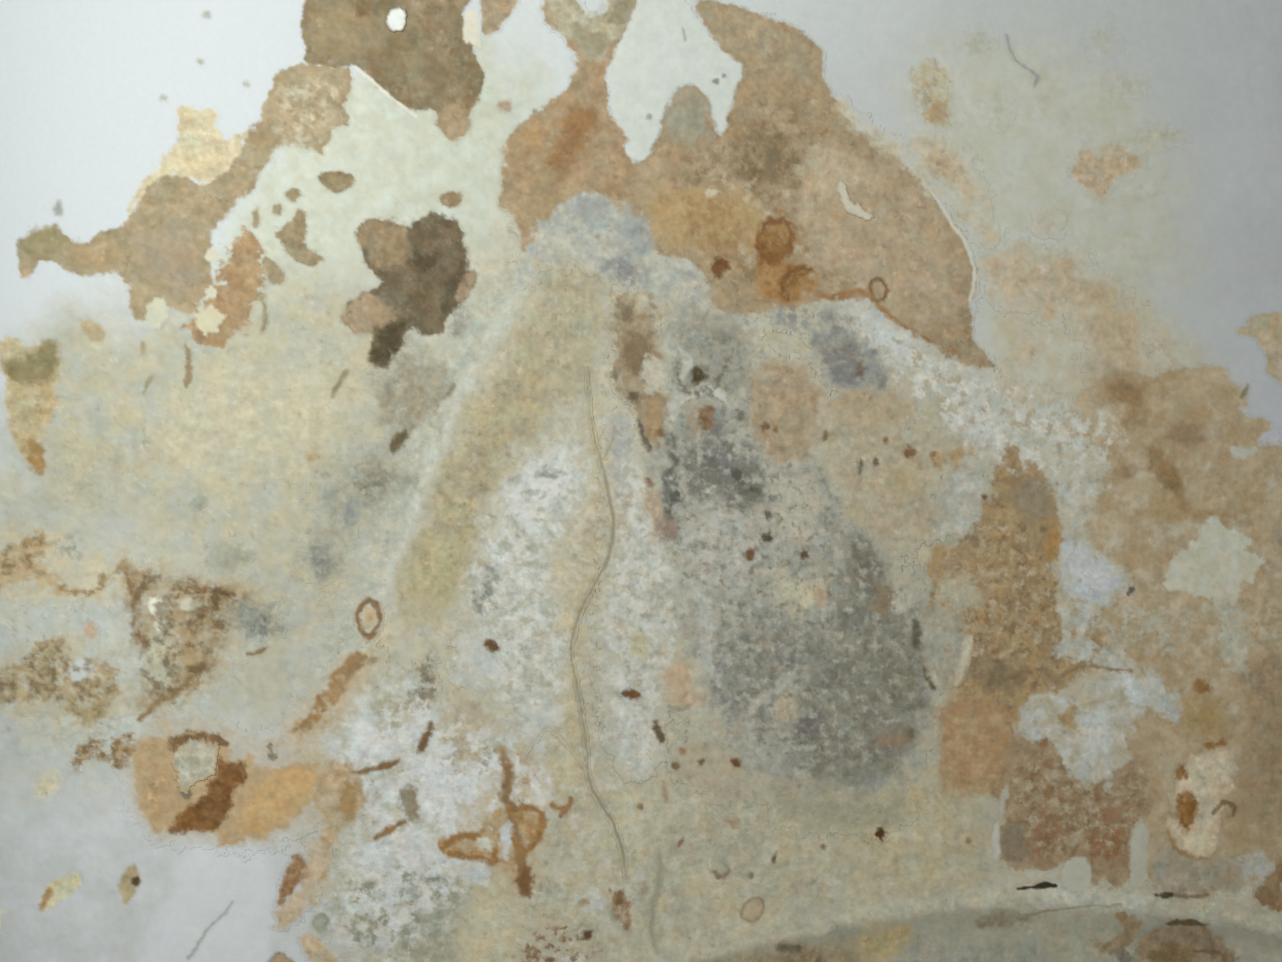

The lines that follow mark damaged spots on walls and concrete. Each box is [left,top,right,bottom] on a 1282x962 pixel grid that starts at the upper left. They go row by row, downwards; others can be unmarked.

peeling [14,0,520,389]
peeling [496,0,997,369]
leakage [903,129,1154,376]
peeling [1235,310,1282,387]
rust [0,511,443,962]
rust [426,741,652,962]
crack [521,366,667,956]
leakage [46,187,1282,962]
peeling [920,358,1282,962]